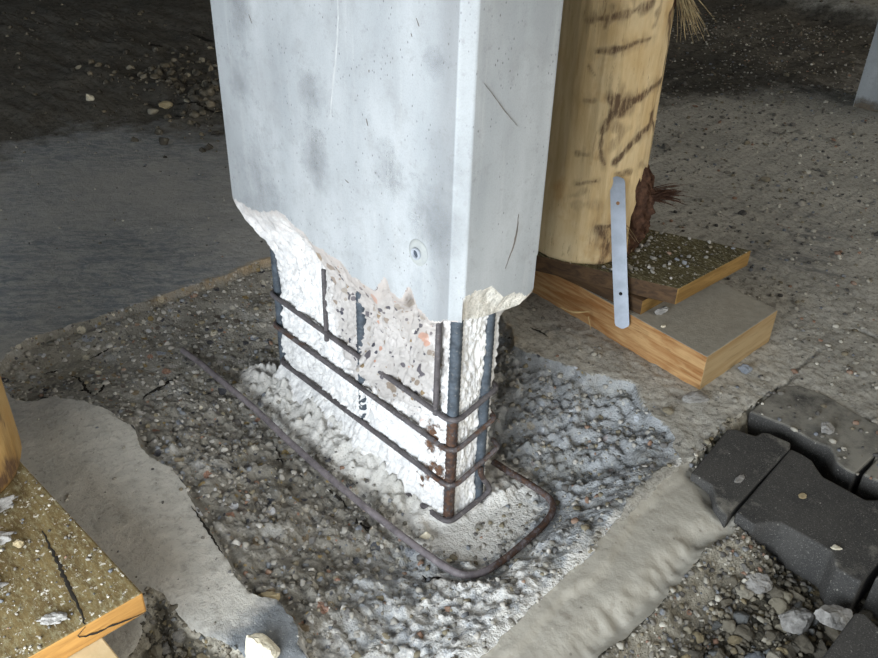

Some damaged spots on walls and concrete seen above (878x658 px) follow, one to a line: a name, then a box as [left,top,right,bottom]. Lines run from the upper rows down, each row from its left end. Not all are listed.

crack [143,374,180,399]
spalling [0,198,682,658]
corrosion [416,417,445,487]